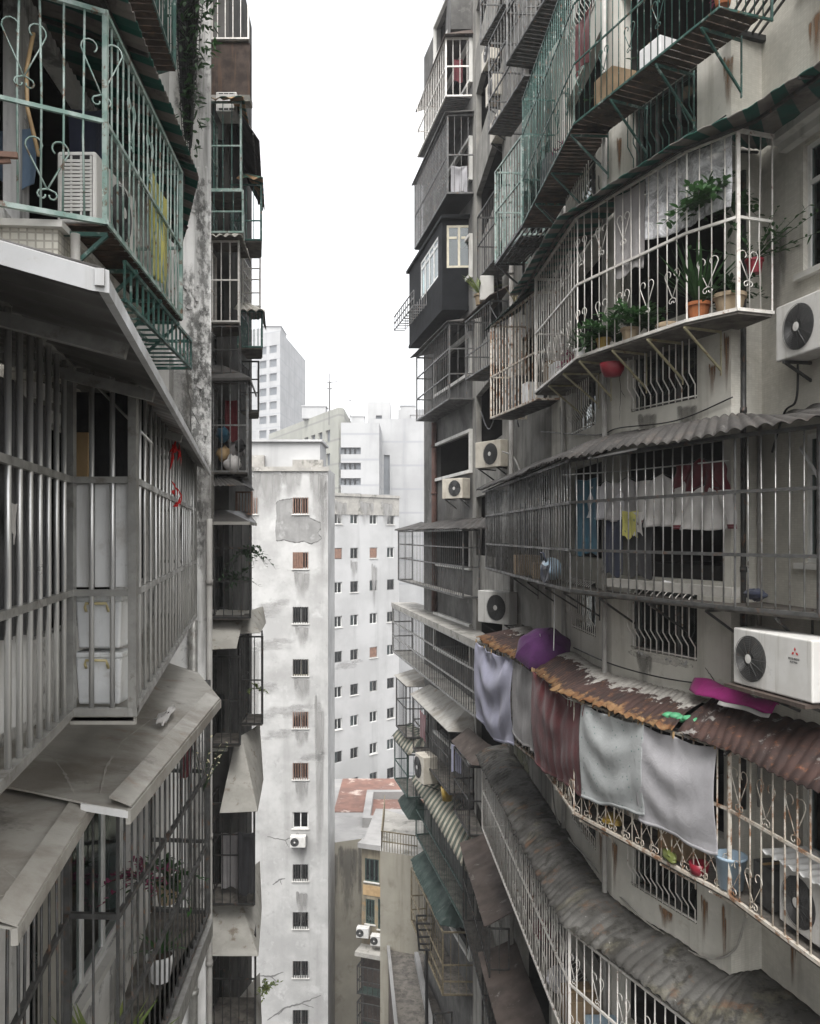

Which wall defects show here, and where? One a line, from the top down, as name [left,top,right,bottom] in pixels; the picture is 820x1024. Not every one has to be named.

corrosion [723,56,733,95]
peeling [275,498,322,544]
crack [268,995,321,1020]